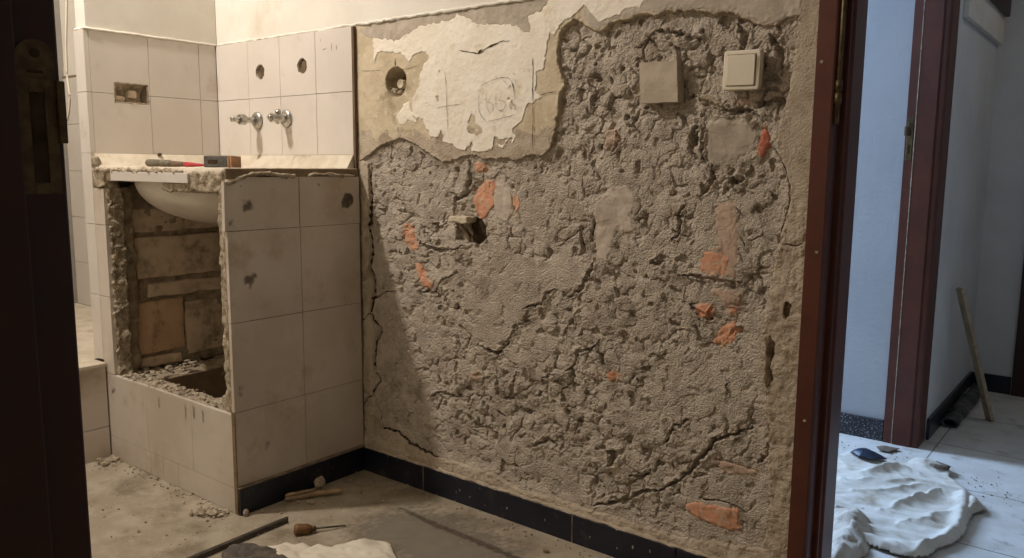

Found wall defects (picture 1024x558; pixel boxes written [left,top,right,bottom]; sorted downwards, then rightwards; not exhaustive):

crack [362,169,437,457]
flaking render [126,0,802,549]